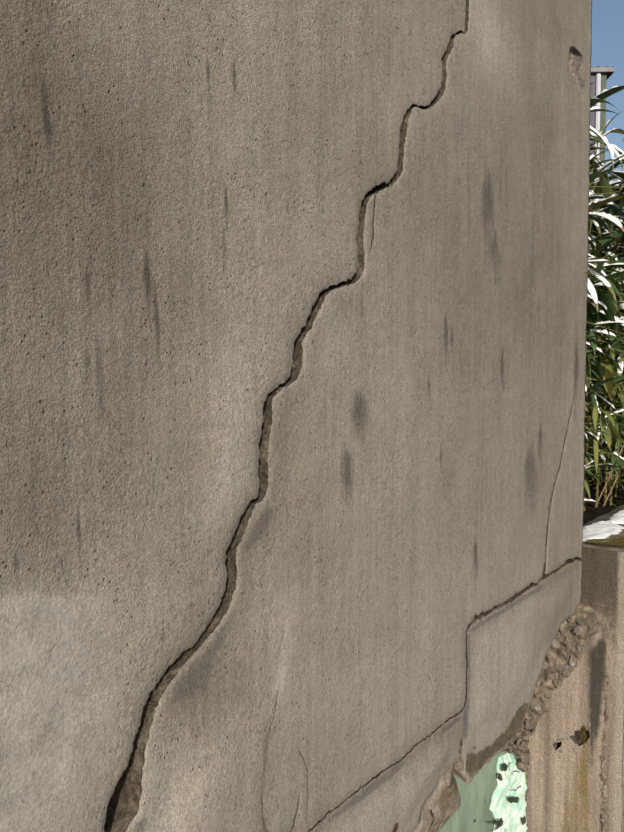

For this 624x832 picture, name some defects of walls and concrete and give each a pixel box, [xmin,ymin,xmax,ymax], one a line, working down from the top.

spalling [568,46,585,89]
crack [104,0,469,832]
crack [290,396,581,832]
peeling [413,764,461,832]
spalling [486,604,610,832]
damp [566,640,606,819]